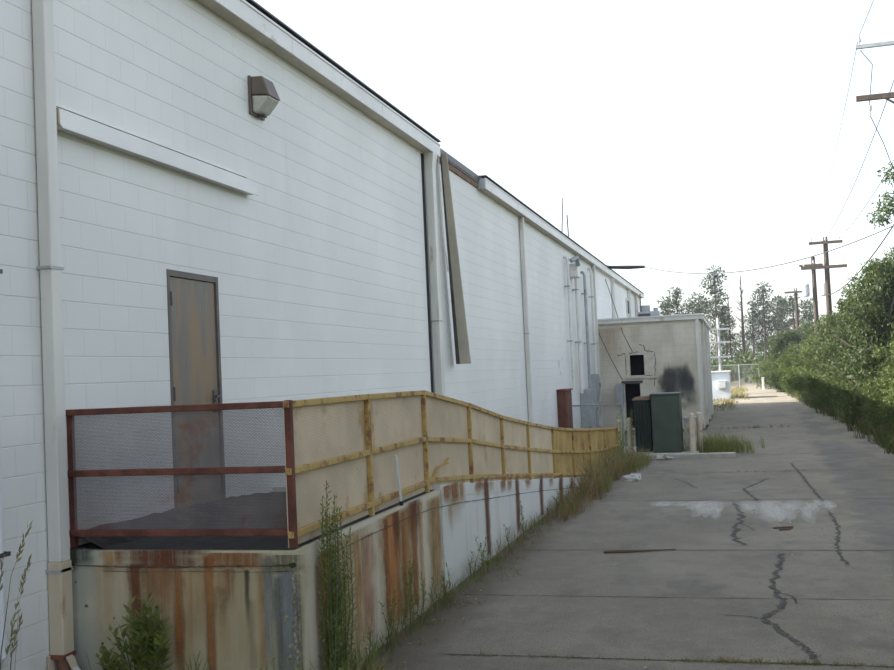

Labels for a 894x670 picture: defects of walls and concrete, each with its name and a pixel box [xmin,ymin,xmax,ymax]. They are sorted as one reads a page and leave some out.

corrosion [130,550,262,670]
corrosion [338,531,374,650]
corrosion [384,483,463,621]
corrosion [476,477,491,555]
corrosion [501,474,582,533]
crack [730,478,768,545]
crack [732,554,817,660]
crack [791,463,849,564]